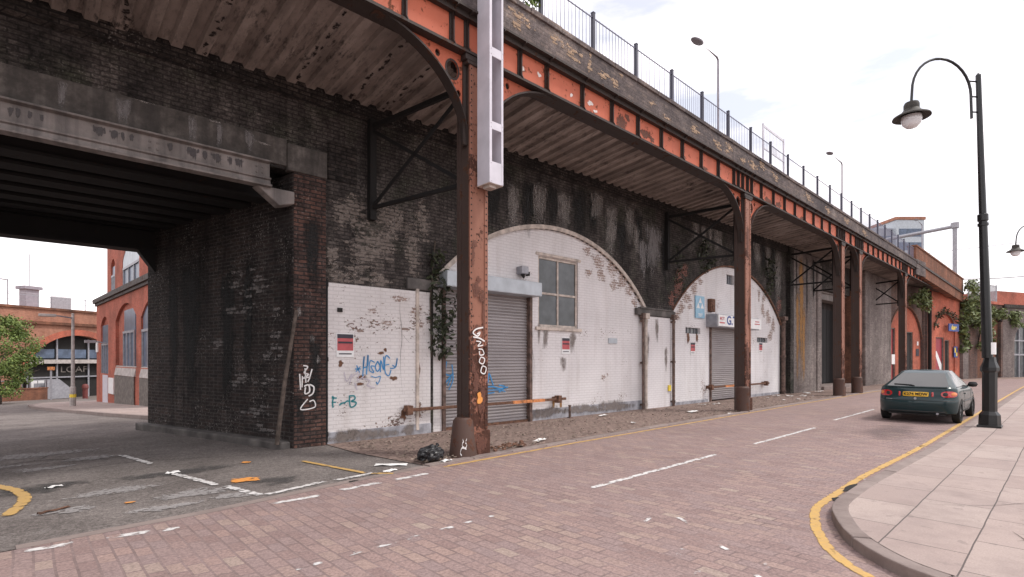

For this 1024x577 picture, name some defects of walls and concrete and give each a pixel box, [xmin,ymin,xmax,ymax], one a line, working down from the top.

spalling [550,35,623,89]
spalling [713,139,779,182]
damp [305,220,319,278]
damp [488,183,665,273]
peeling [583,247,637,307]
peeling [368,296,424,331]